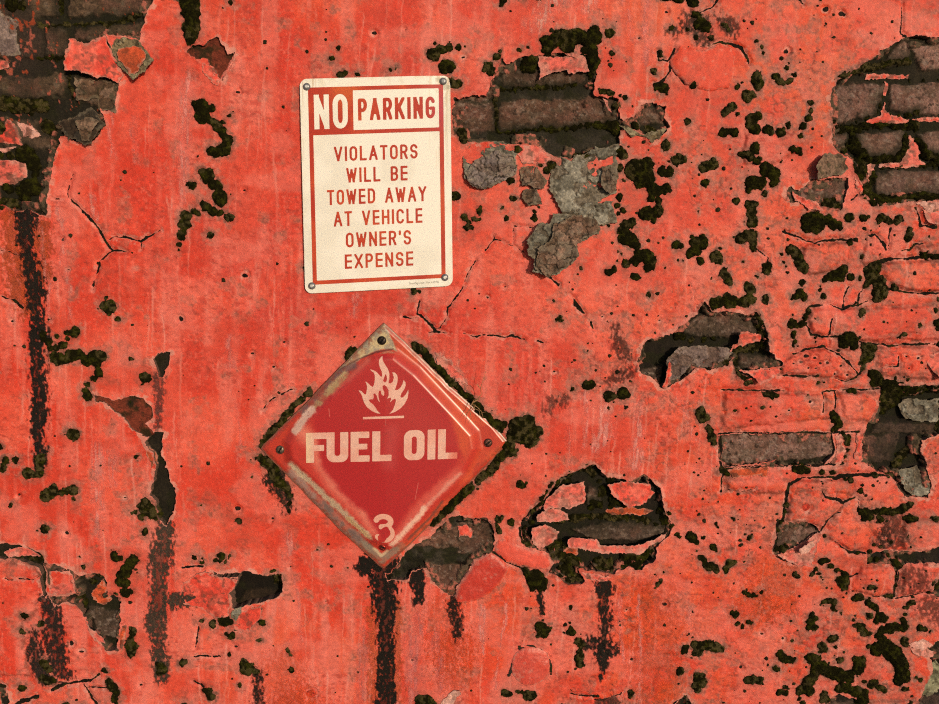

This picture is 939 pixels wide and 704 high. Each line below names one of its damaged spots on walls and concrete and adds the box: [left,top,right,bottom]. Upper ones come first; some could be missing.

damp [14,209,52,472]
spalling [0,0,154,216]
crack [56,174,161,290]
crack [403,225,544,343]
spalling [451,53,668,278]
crack [782,207,937,264]
spalling [787,37,939,224]
crack [718,286,939,578]
damp [145,520,196,685]
damp [353,552,426,704]
spalling [521,464,671,584]
damp [583,576,624,683]